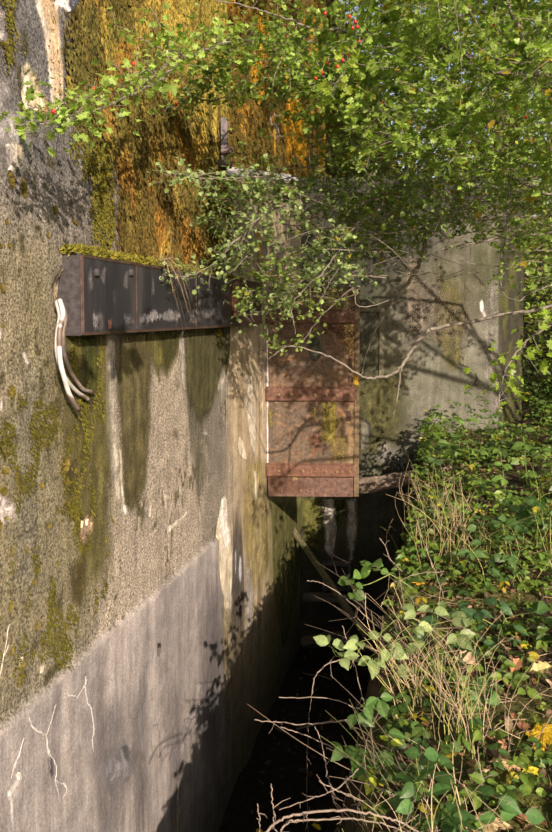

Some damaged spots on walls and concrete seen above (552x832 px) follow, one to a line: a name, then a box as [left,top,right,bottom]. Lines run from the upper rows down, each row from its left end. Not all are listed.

spalling [54,0,81,13]
damp [407,256,461,345]
damp [160,330,186,390]
damp [217,359,229,403]
damp [480,285,500,421]
damp [81,335,130,515]
damp [188,399,207,496]
damp [378,442,416,471]
damp [324,498,356,560]
damp [72,557,85,604]
crack [11,677,95,798]